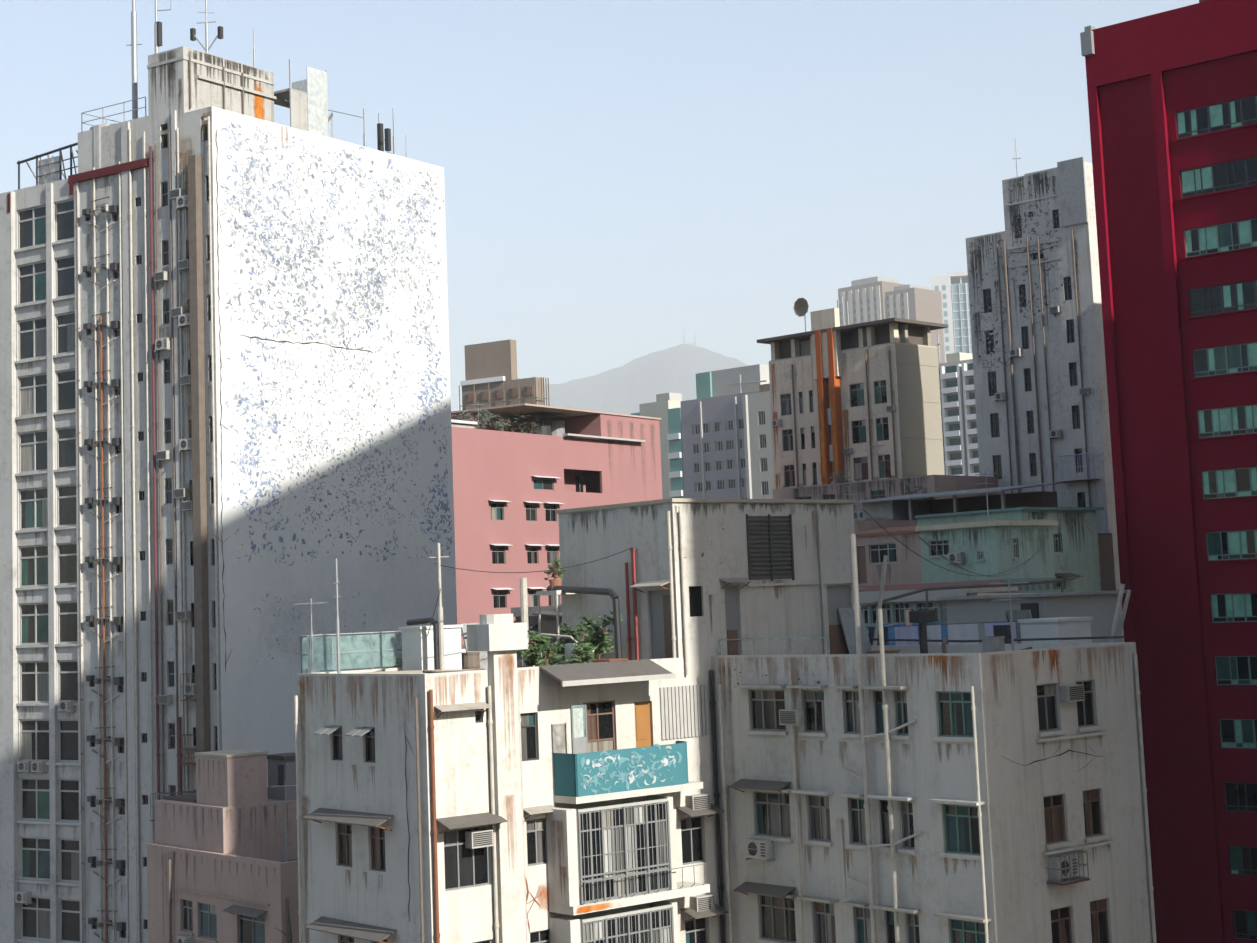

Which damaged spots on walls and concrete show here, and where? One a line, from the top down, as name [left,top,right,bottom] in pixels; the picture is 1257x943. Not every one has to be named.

crack [213,130,373,672]
peeling [220,116,452,566]
leakage [972,172,1054,349]
corrosion [928,656,958,680]
corrosion [1034,650,1058,673]
peeling [580,744,682,795]